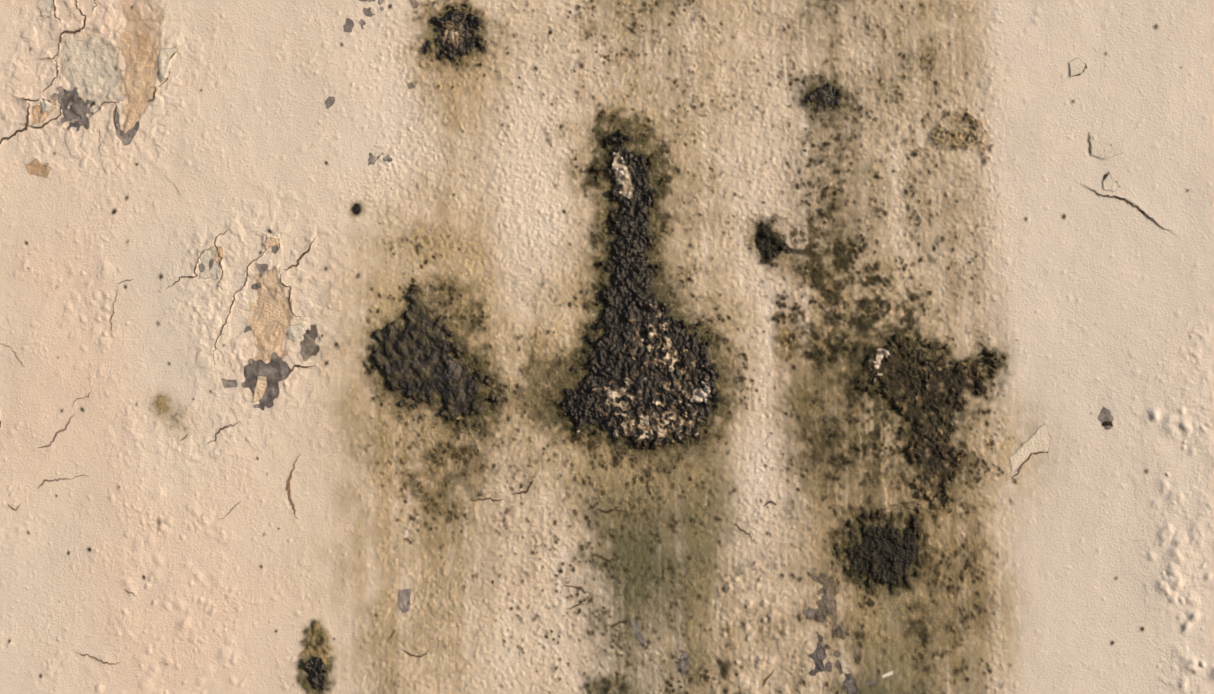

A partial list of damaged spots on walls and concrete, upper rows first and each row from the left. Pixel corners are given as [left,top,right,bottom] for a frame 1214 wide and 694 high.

peeling [0,0,179,145]
leakage [419,0,488,102]
leakage [557,0,705,92]
peeling [26,159,51,177]
crack [1090,189,1164,230]
peeling [166,229,319,410]
leakage [351,86,758,675]
leakage [749,5,1019,694]
peeling [1010,424,1051,481]
leakage [297,620,334,694]